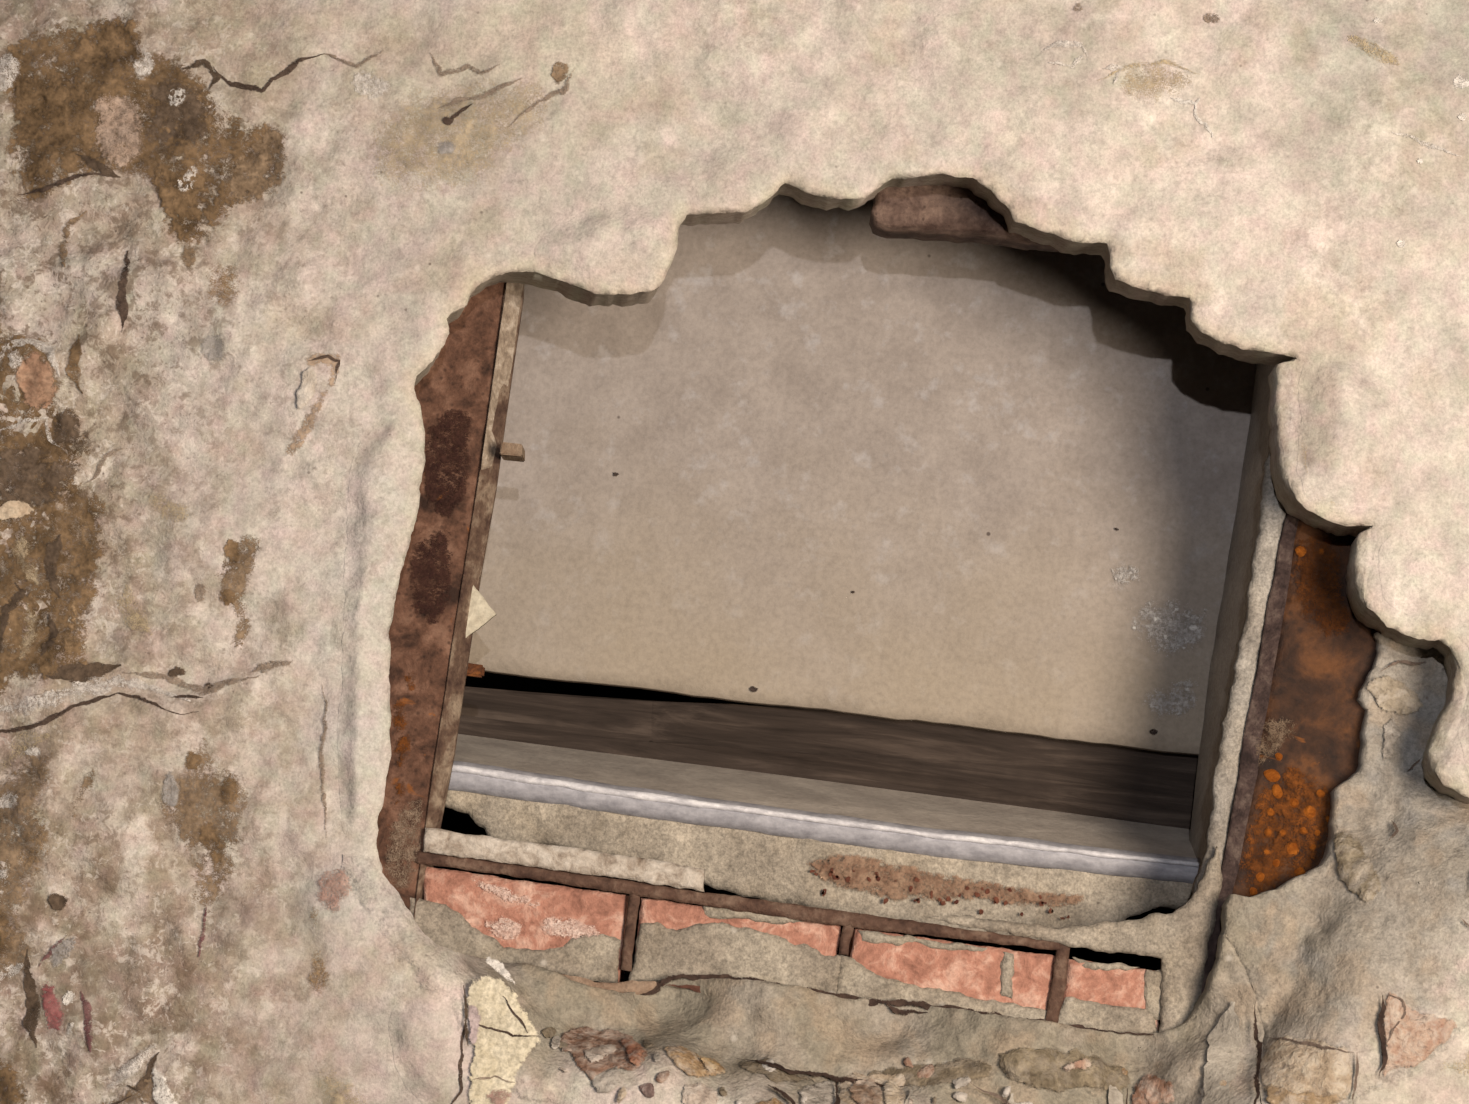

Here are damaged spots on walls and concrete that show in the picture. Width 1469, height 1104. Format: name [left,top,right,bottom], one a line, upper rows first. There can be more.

corrosion [409,408,472,624]
crack [0,660,291,733]
corrosion [384,673,423,890]
spalling [307,632,1469,1104]
corrosion [806,853,1084,920]
corrosion [1239,753,1331,896]
flaking render [99,1045,179,1104]